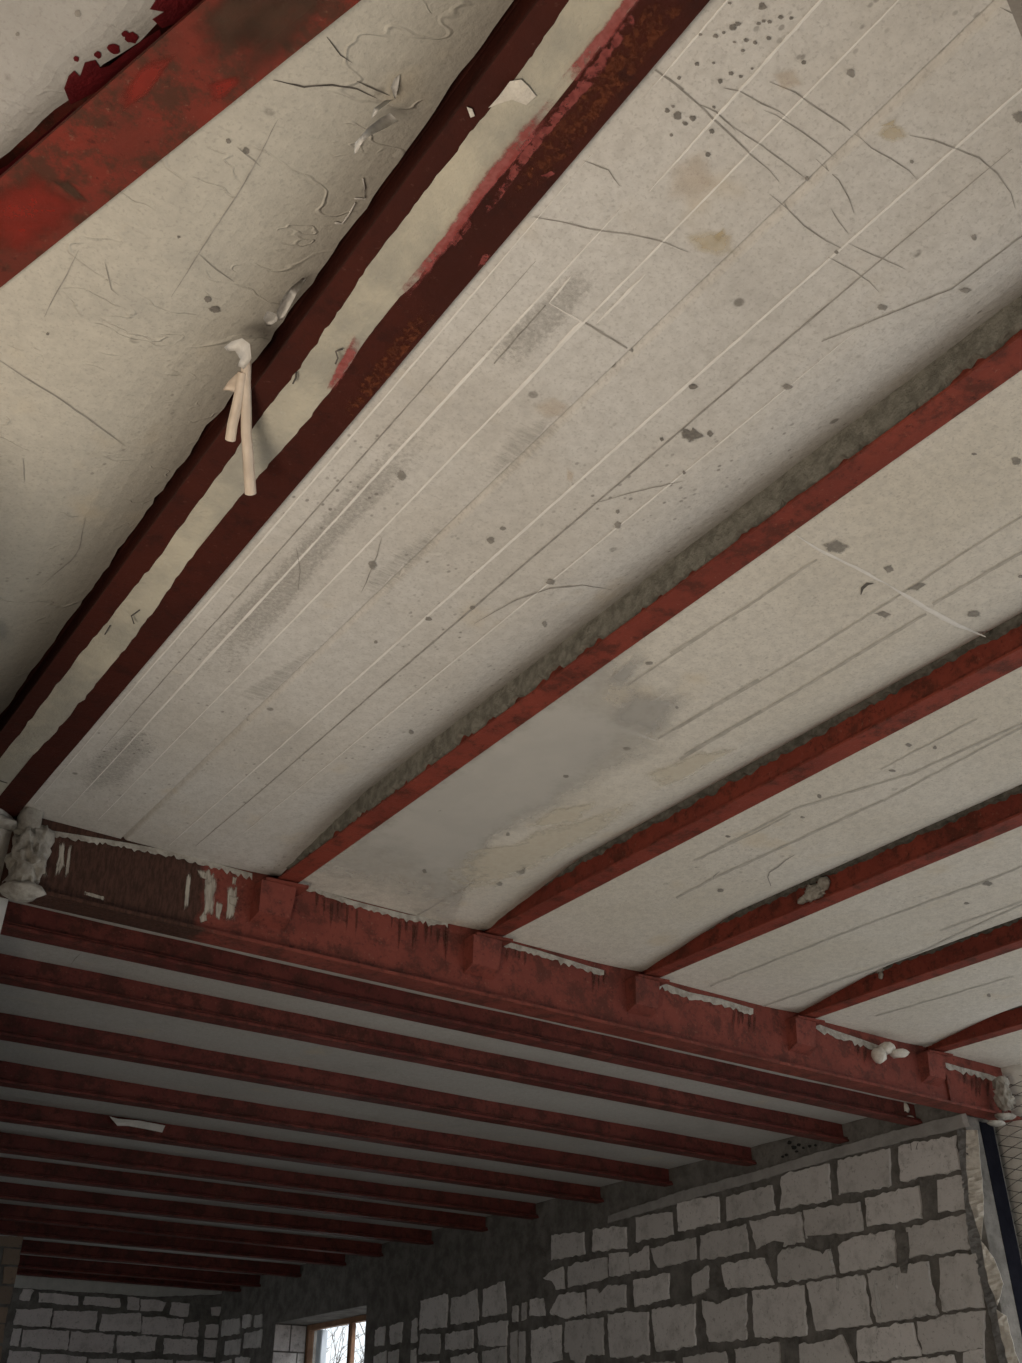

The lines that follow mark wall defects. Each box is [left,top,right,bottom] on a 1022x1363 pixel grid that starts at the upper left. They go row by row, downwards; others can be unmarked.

crack [274,37,390,98]
peeling [486,14,635,210]
water stain [324,662,655,904]